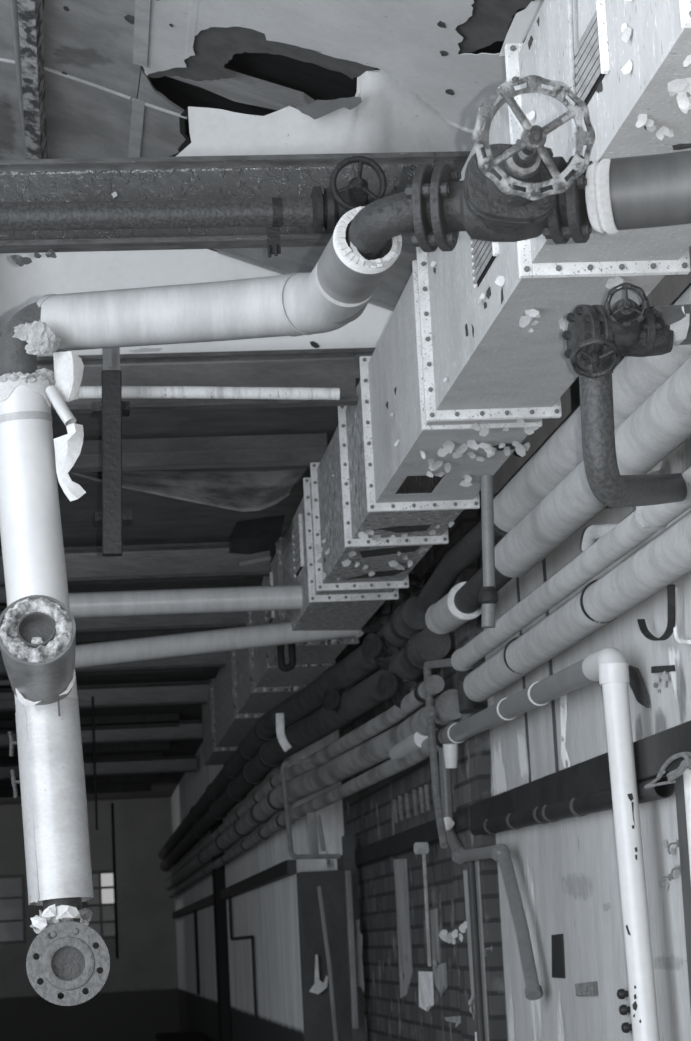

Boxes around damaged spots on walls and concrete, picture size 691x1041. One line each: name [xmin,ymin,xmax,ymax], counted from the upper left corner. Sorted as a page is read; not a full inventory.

peeling [621,59,633,75]